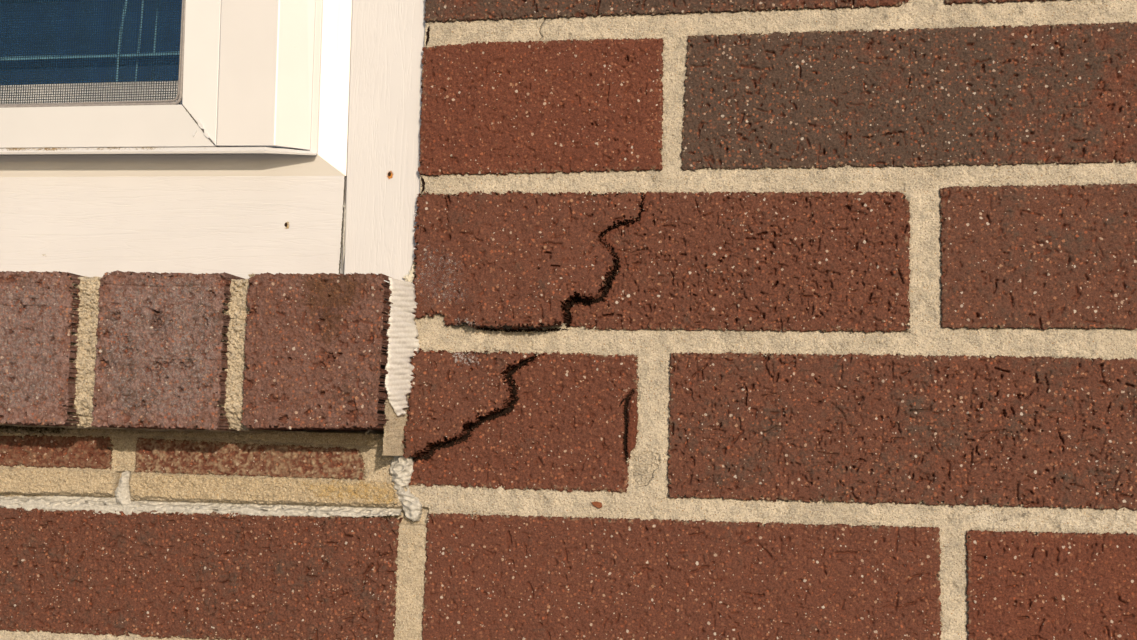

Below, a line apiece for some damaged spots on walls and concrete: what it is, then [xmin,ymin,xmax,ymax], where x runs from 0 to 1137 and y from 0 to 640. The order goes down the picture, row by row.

crack [412,176,645,333]
crack [619,392,638,461]